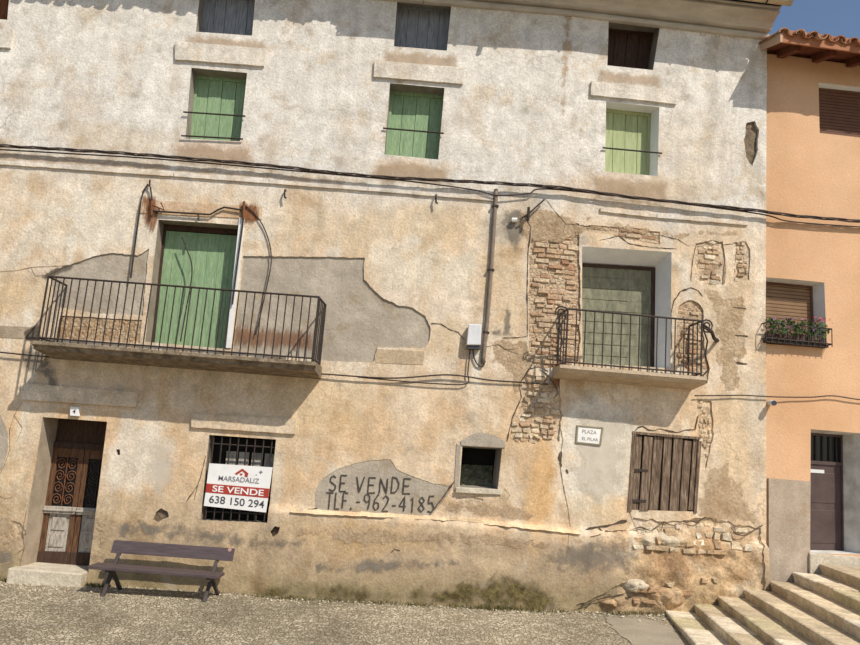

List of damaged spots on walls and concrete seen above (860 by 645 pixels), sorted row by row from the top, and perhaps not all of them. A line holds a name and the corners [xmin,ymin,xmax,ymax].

corrosion [240,204,259,223]
flaking render [233,256,430,362]
crack [487,215,706,554]
flaking render [491,209,750,444]
crack [548,202,741,349]
flaking render [572,400,766,614]